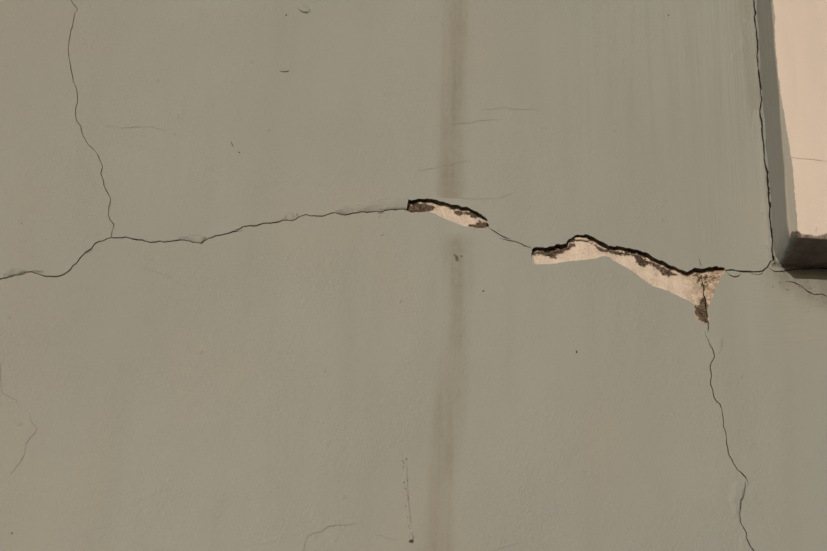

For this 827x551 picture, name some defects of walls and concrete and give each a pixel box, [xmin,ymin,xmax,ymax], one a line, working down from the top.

crack [0,0,407,280]
spalling [407,199,490,228]
crack [489,225,531,248]
spalling [531,234,725,323]
crack [725,0,827,296]
crack [705,322,754,551]